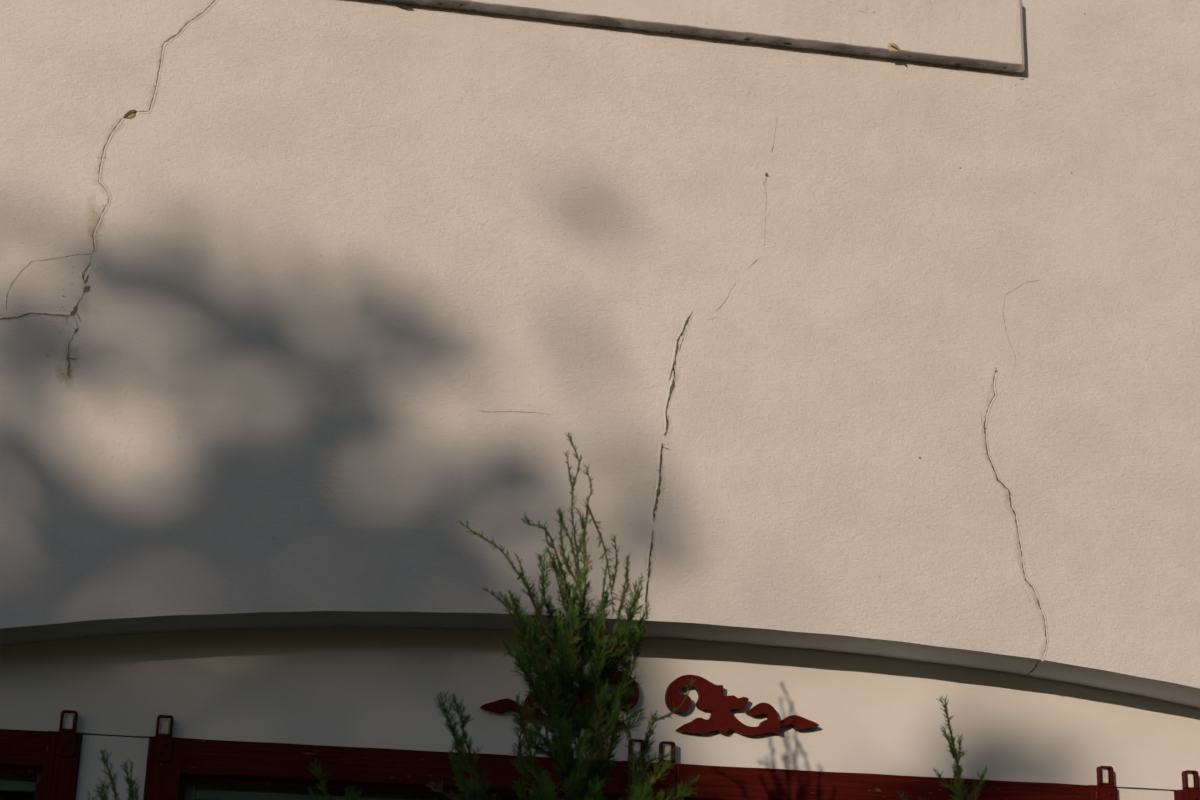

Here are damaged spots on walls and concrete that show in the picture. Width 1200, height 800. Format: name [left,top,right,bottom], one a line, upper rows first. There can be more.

crack [0,0,218,378]
crack [643,292,730,625]
crack [981,280,1049,675]